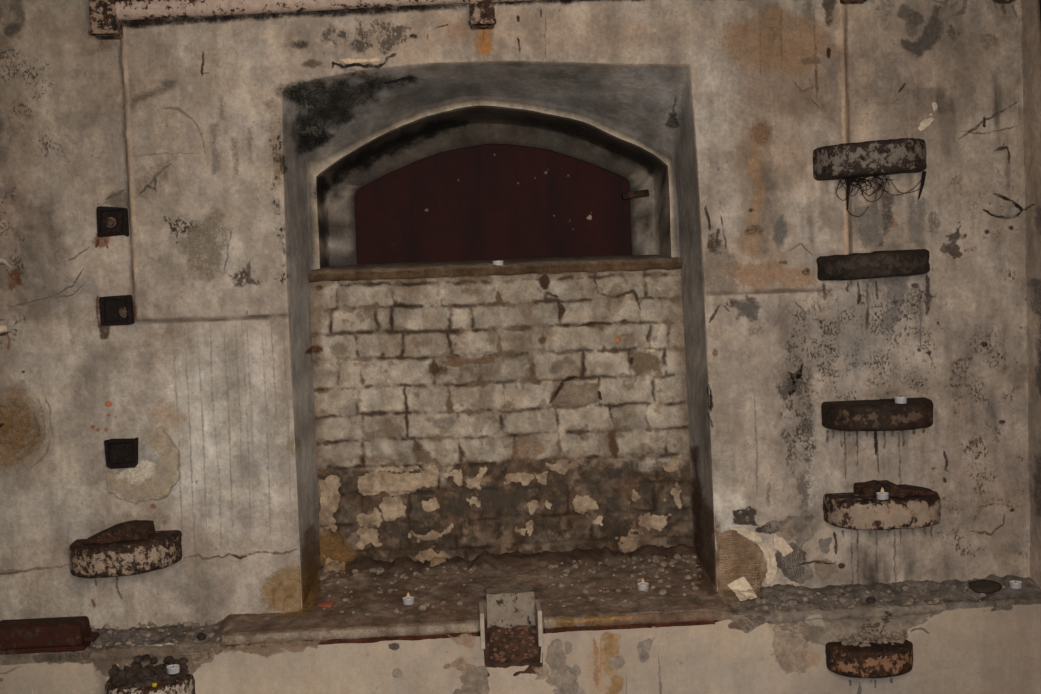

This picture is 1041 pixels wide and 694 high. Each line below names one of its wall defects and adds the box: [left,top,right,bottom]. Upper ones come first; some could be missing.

damp [726,0,836,106]
damp [269,73,416,185]
damp [702,199,947,519]
damp [950,328,1017,414]
peeling [317,475,341,532]
peeling [356,442,487,550]
peeling [408,523,454,567]
peeling [572,495,603,526]
peeling [615,456,682,554]
spalling [709,507,946,674]
damp [960,426,1019,509]
corrosion [561,616,637,694]